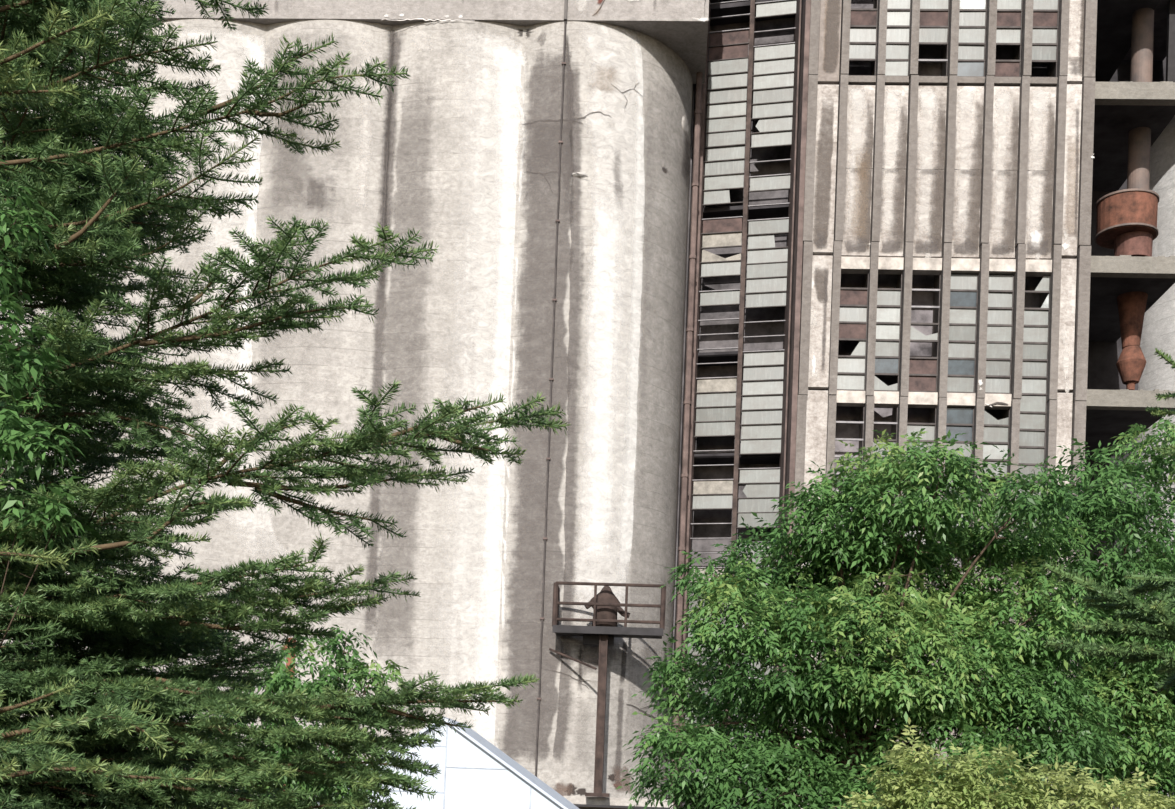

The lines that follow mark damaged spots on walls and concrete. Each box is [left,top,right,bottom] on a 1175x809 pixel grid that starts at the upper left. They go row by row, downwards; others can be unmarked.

damp [372,34,425,424]
damp [815,107,833,247]
damp [847,109,983,252]
damp [992,106,1055,254]
damp [504,40,627,780]
damp [366,483,413,630]